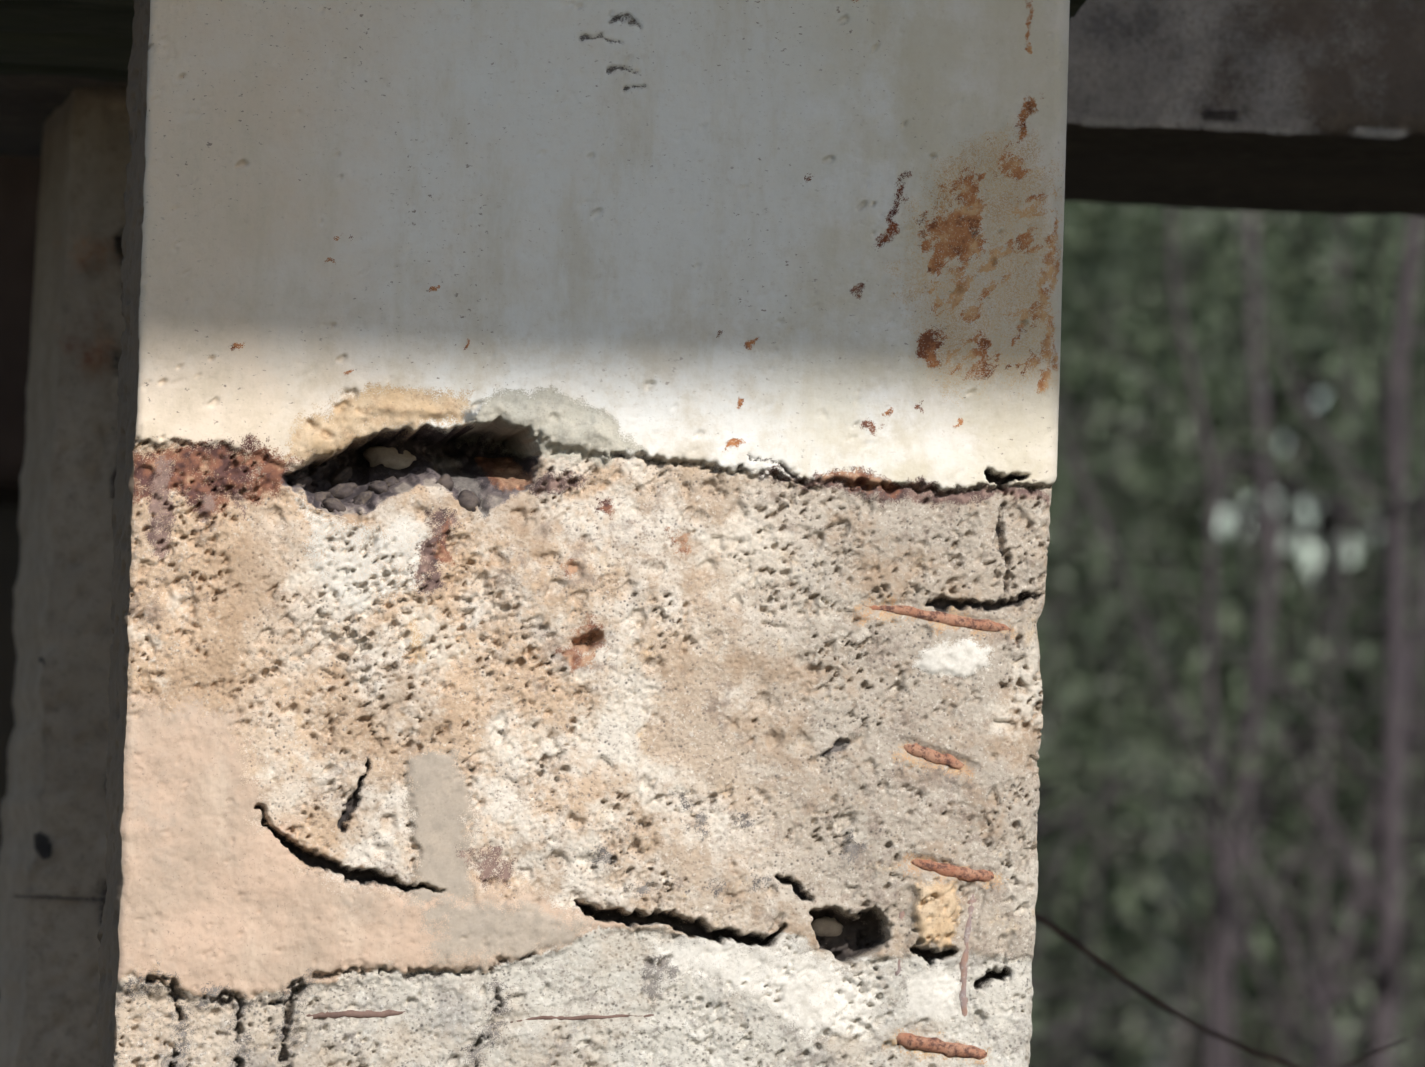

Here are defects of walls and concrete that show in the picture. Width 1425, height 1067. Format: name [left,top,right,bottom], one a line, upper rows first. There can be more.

corrosion [850,93,1064,428]
corrosion [132,433,307,562]
crack [604,452,665,465]
crack [702,454,835,482]
corrosion [859,407,893,436]
crack [925,467,1046,613]
corrosion [852,592,1018,642]
spalling [113,419,1052,1067]
crack [255,758,441,893]
crack [575,874,814,947]
crack [121,954,533,1067]
corrosion [881,1027,993,1065]